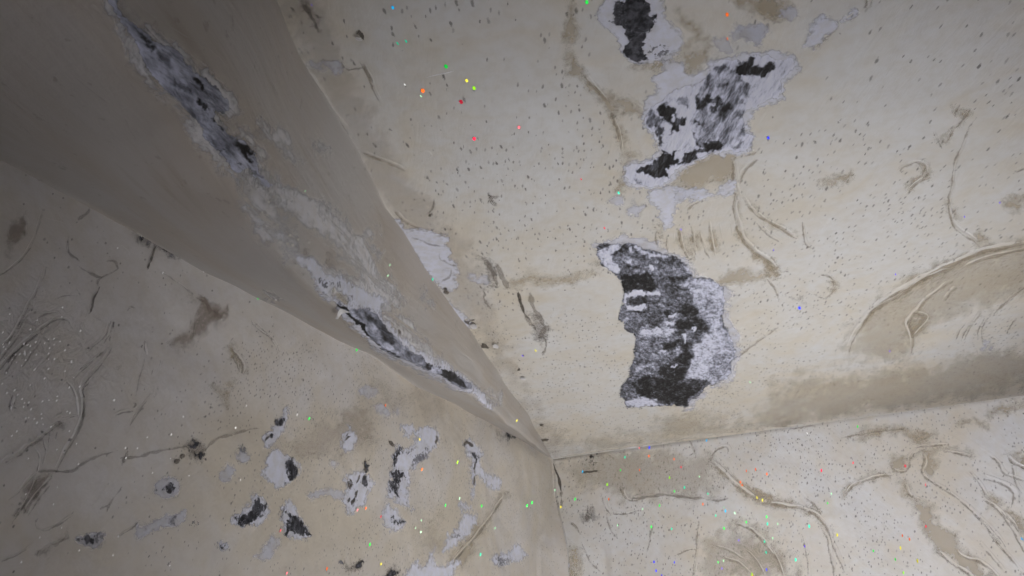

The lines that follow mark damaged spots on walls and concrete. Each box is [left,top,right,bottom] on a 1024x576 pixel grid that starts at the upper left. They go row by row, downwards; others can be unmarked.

spalling [585,0,802,229]
spalling [104,0,503,410]
spalling [594,235,741,411]
spalling [230,494,312,540]
spalling [261,408,300,489]
spalling [341,460,375,515]
spalling [382,424,439,531]
spalling [405,437,502,576]